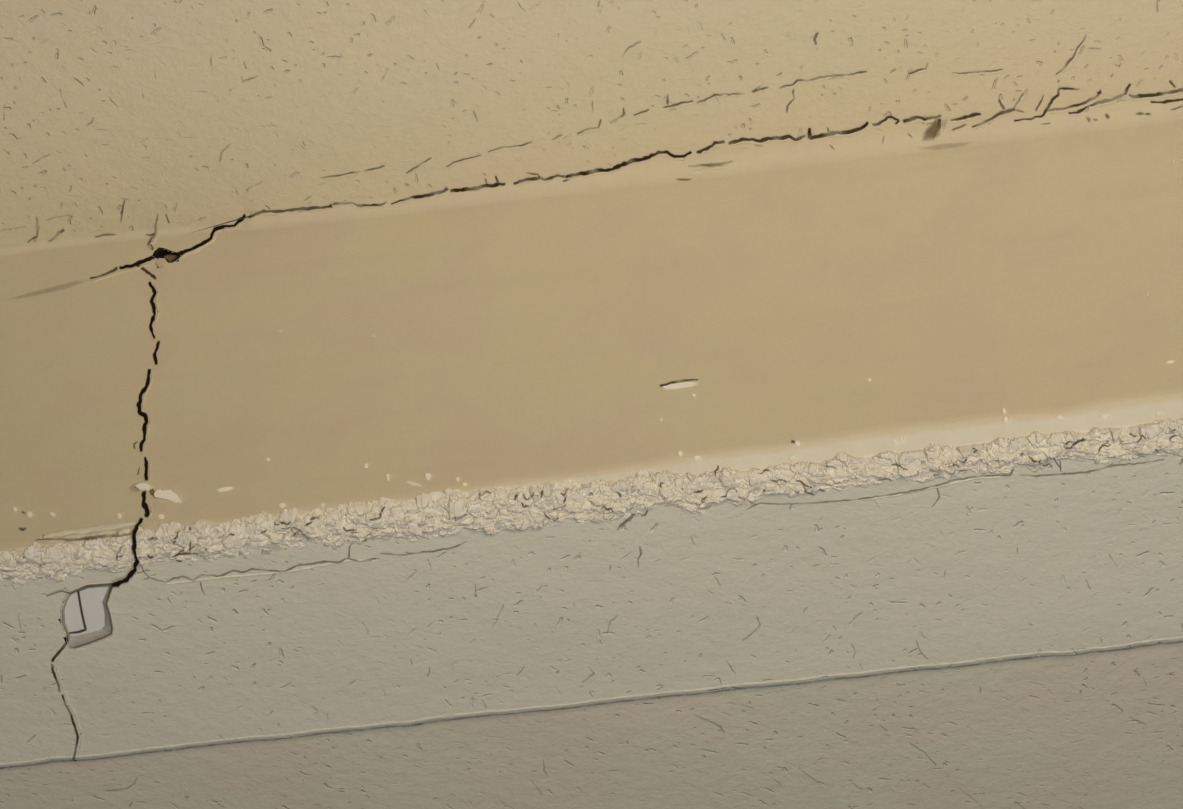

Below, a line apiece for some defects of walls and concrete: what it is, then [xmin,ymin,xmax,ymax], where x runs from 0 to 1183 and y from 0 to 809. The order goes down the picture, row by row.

crack [90,41,1183,593]
flaking render [0,411,1183,650]
crack [0,637,1183,766]